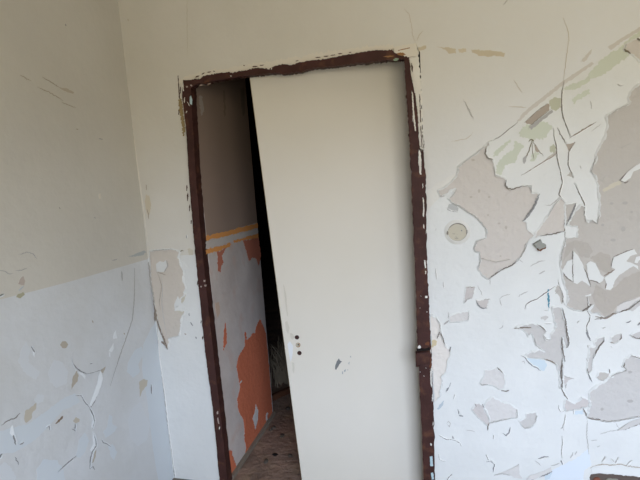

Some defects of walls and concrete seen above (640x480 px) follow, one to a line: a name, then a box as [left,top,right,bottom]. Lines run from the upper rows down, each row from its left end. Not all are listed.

crack [495,18,600,221]
peeling [564,31,640,104]
peeling [206,229,261,272]
peeling [437,83,640,392]
peeling [0,371,86,454]
crack [110,268,135,386]
peeling [139,248,187,480]
peeling [236,320,272,453]
peeling [429,286,490,410]
peeling [471,396,538,430]
peeling [563,330,640,431]
peeling [590,465,640,480]